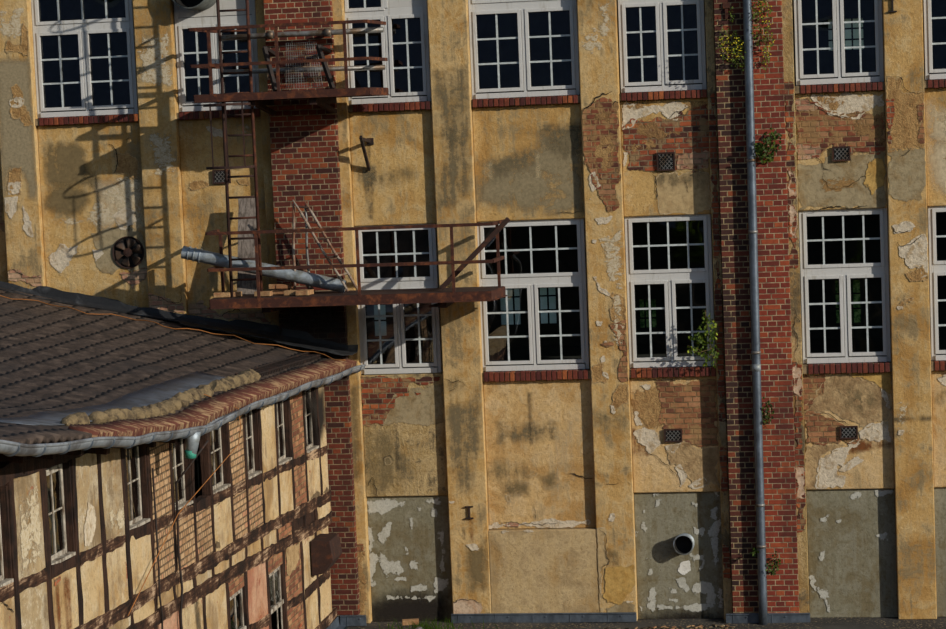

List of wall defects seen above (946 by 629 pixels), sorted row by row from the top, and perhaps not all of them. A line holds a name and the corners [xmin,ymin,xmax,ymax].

flaking render [0,166,34,237]
damp [0,60,99,214]
flaking render [60,153,147,289]
damp [435,69,468,206]
damp [481,127,582,213]
flaking render [784,76,946,268]
flaking render [489,93,731,615]
damp [496,466,527,493]
damp [500,416,550,442]
peeling [357,497,454,615]
flaking render [451,598,482,614]
peeling [809,575,830,612]